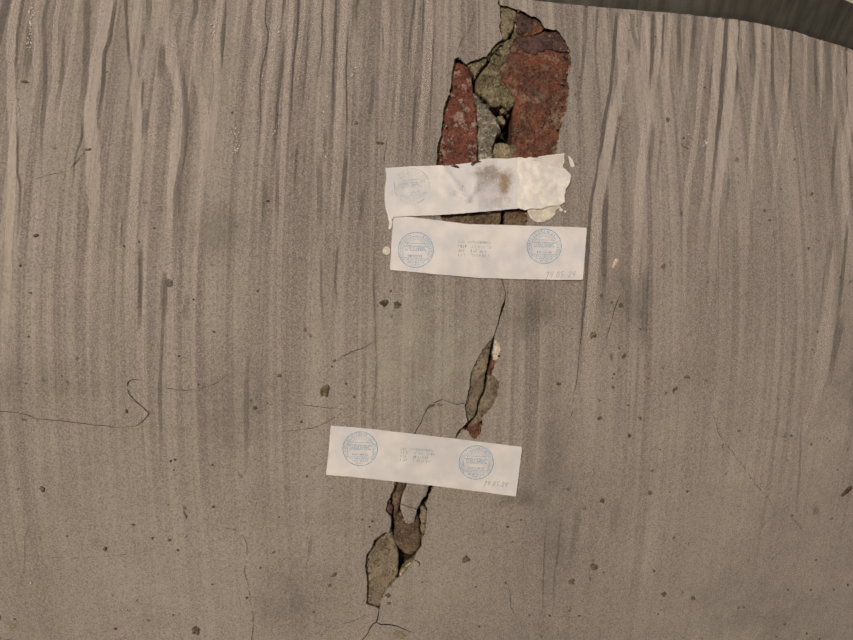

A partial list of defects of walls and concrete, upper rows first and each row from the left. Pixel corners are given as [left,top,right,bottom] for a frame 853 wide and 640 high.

water stain [101,0,127,87]
water stain [272,0,300,134]
water stain [319,0,337,158]
flaking render [436,5,572,166]
water stain [712,18,740,133]
flaking render [440,208,528,226]
crack [493,279,506,338]
crack [0,379,149,428]
crack [415,400,464,434]
flaking render [455,338,501,439]
flaking render [365,482,434,609]
crack [362,609,411,640]